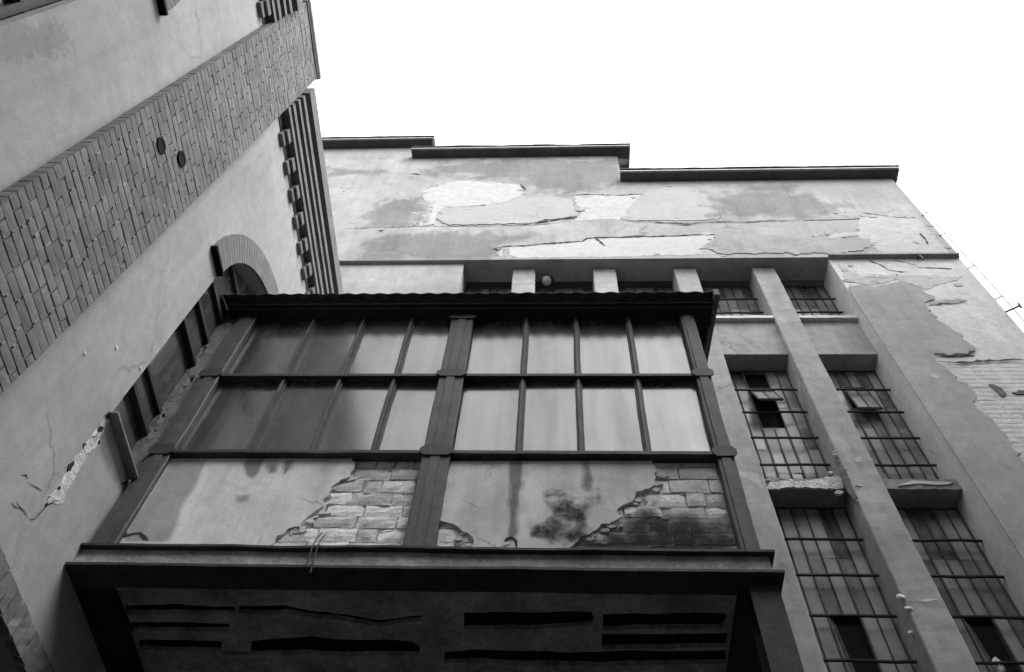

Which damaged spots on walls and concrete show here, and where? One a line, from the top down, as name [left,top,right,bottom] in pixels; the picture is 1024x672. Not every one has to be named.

flaking render [410,181,525,226]
flaking render [573,194,640,222]
flaking render [495,232,726,259]
flaking render [819,214,951,253]
flaking render [838,262,963,290]
flaking render [949,363,1024,459]
flaking render [45,415,110,506]
crack [11,474,59,520]
flaking render [274,461,421,546]
flaking render [437,522,474,547]
mould [531,494,736,549]
flaking render [574,463,737,549]